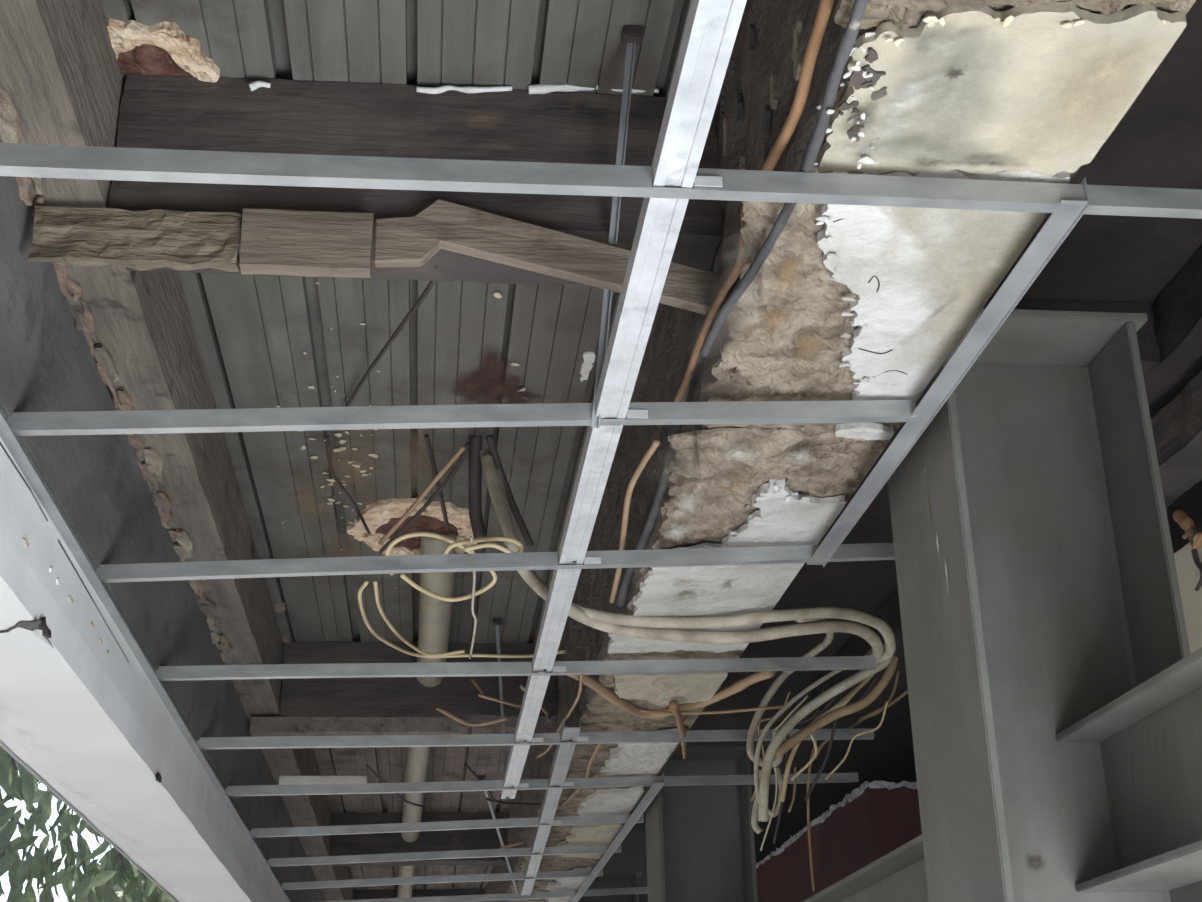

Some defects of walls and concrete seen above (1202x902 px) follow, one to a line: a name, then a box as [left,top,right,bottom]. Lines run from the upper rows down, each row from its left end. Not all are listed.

spalling [106,18,220,83]
peeling [720,57,745,170]
spalling [816,0,1179,169]
spalling [705,201,871,402]
spalling [298,429,477,556]
spalling [658,426,884,549]